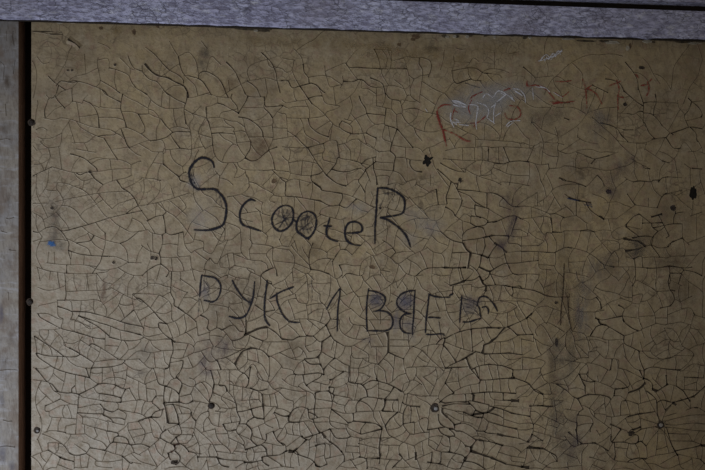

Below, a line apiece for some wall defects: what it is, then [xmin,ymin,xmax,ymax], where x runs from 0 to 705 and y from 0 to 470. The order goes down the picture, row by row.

crack [31,41,648,470]